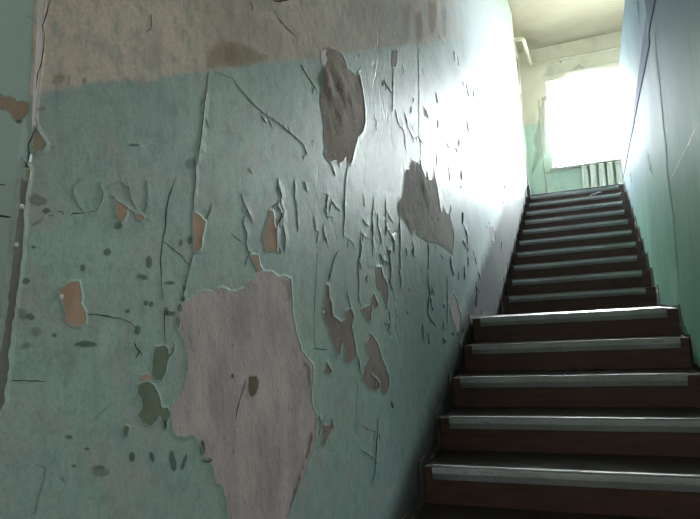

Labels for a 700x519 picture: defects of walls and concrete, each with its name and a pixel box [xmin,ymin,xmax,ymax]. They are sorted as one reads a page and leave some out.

spalling [0,0,51,417]
peeling [56,279,89,329]
crack [160,179,196,336]
crack [233,193,253,267]
crack [193,72,315,210]
peeling [121,178,391,519]
peeling [319,46,367,176]
peeling [397,158,455,256]